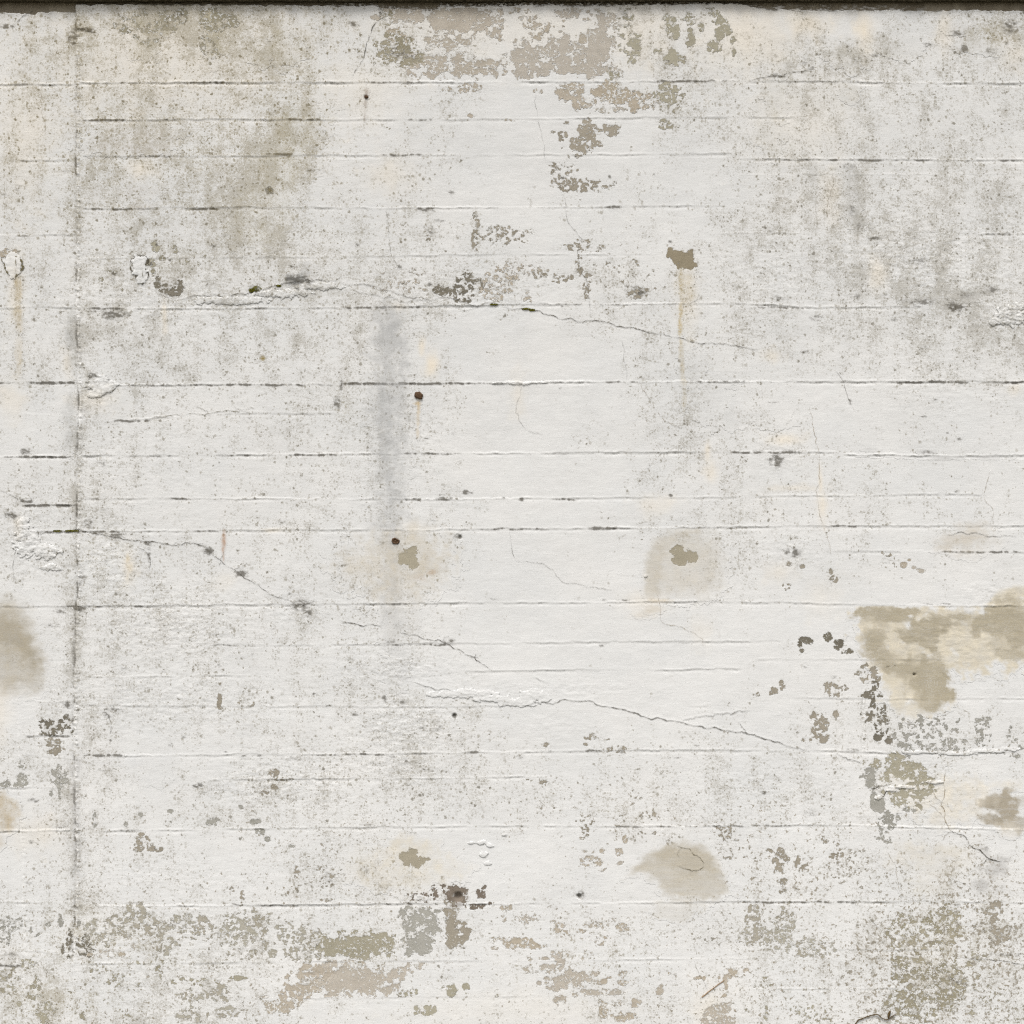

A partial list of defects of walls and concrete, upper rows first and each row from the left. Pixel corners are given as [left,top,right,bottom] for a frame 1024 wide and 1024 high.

peeling [357,7,736,192]
peeling [471,212,532,250]
peeling [373,239,657,303]
leakage [639,527,735,611]
peeling [0,760,28,787]
peeling [38,714,74,799]
crack [535,699,801,749]
peeling [854,662,1024,844]
peeling [287,865,342,902]
peeling [0,883,642,1024]
peeling [879,900,1019,1023]
peeling [790,1005,832,1024]